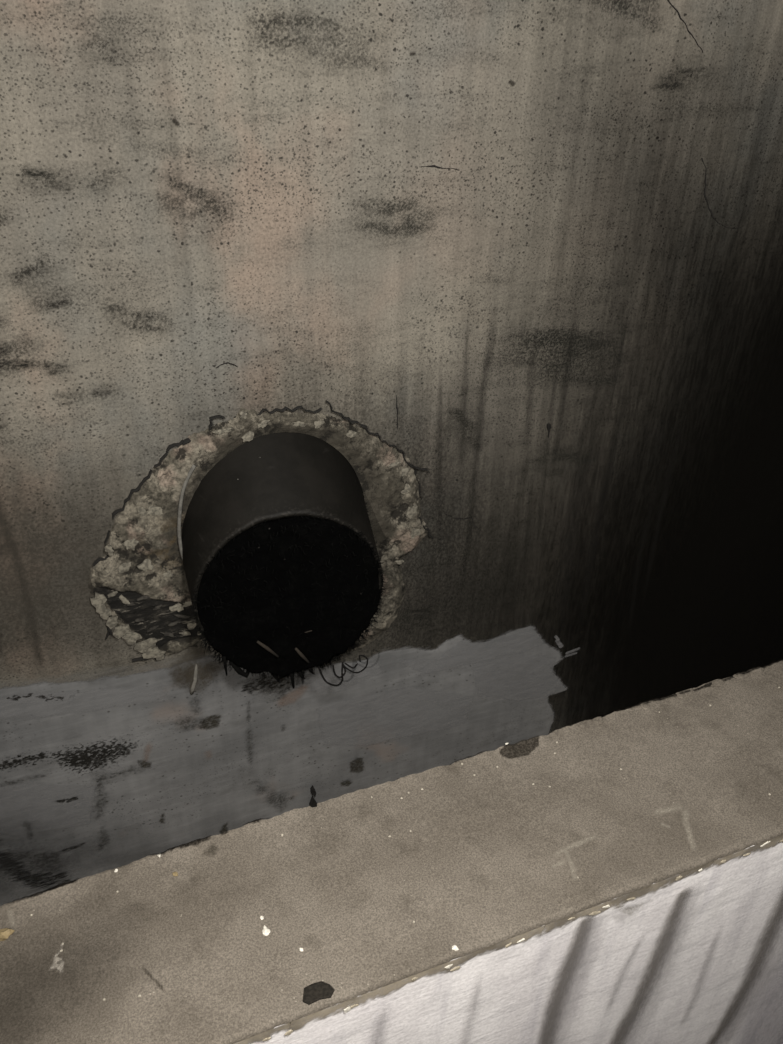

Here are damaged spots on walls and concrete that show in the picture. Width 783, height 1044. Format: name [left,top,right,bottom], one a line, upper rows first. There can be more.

crack [668,0,703,52]
peeling [213,411,270,442]
peeling [292,420,325,428]
peeling [406,504,421,539]
peeling [105,538,173,578]
spalling [90,587,201,662]